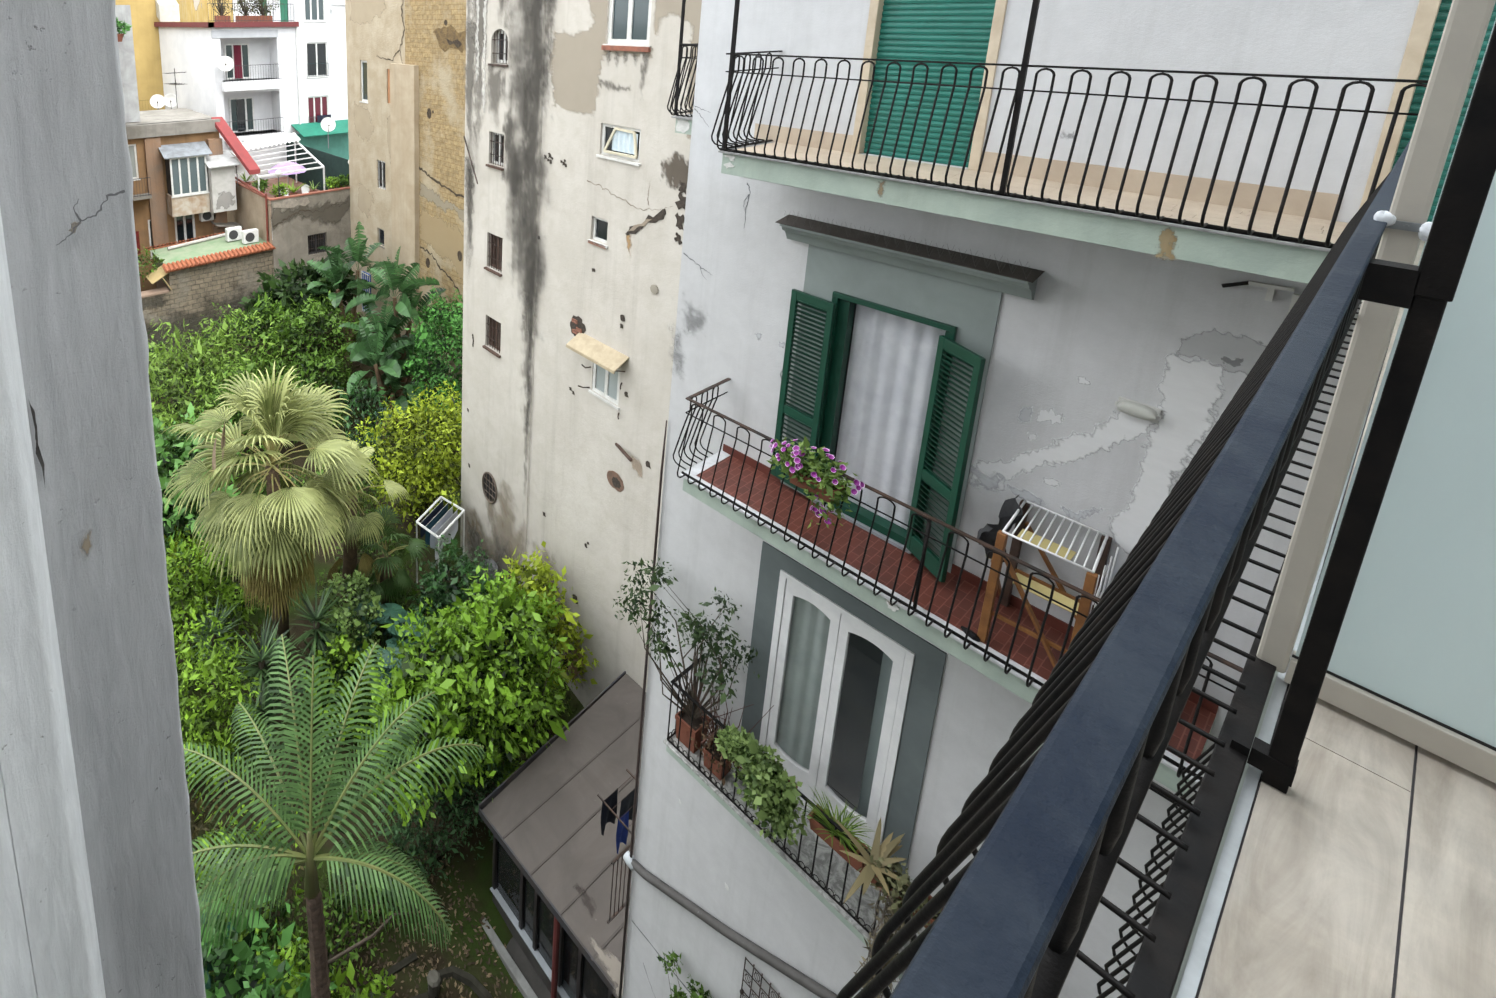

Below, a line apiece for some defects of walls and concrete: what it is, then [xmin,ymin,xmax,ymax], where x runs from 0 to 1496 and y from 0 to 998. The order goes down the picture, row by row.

crack [57,190,125,245]
damp [465,0,554,427]